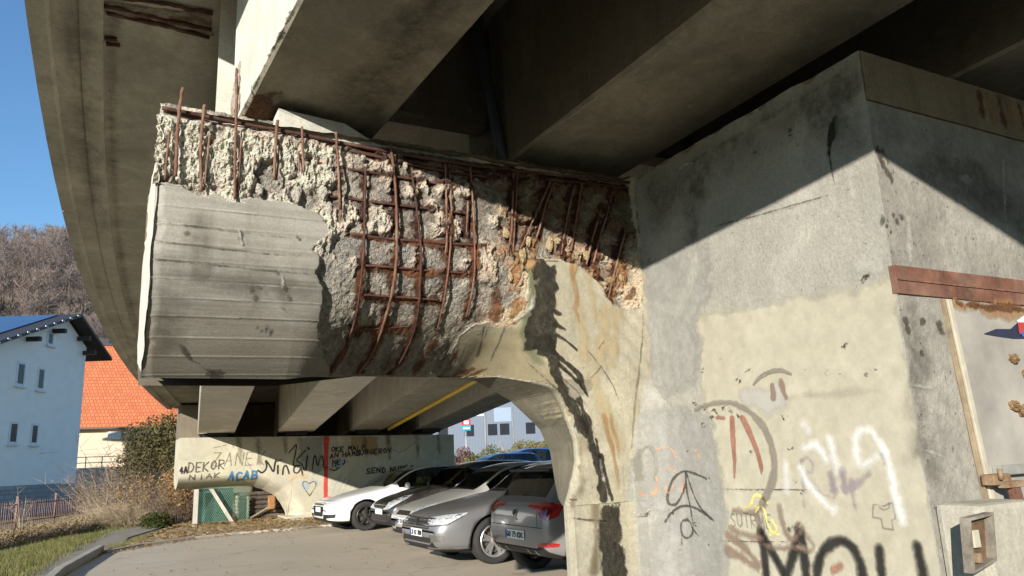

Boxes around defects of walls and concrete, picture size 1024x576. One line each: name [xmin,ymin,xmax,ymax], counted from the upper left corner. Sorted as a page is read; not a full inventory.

rust [242,93,287,121]
damp [823,116,837,235]
spalling [152,61,644,377]
rust [330,199,481,376]
rust [488,286,533,323]
rust [514,239,537,272]
rust [591,253,634,303]
rust [953,299,1024,319]